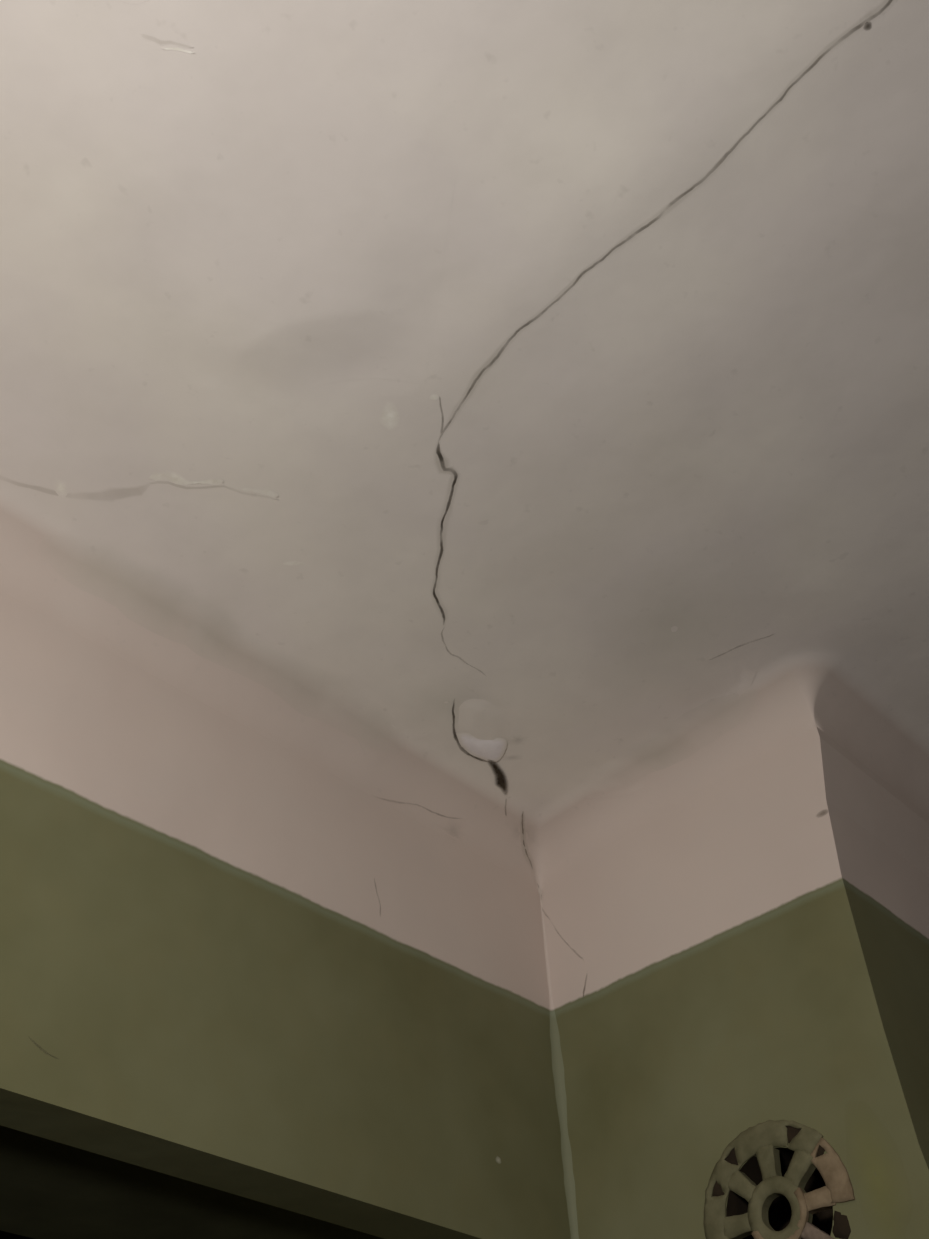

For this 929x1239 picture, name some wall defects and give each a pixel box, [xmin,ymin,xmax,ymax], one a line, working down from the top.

crack [429,0,897,625]
crack [0,470,279,503]
crack [495,811,545,905]